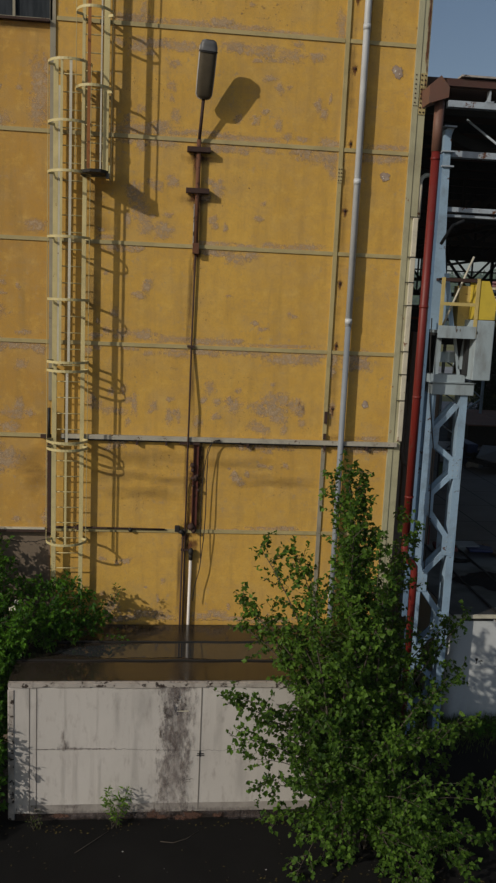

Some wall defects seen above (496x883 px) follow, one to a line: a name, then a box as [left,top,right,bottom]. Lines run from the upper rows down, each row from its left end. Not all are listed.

rust [180,441,204,549]